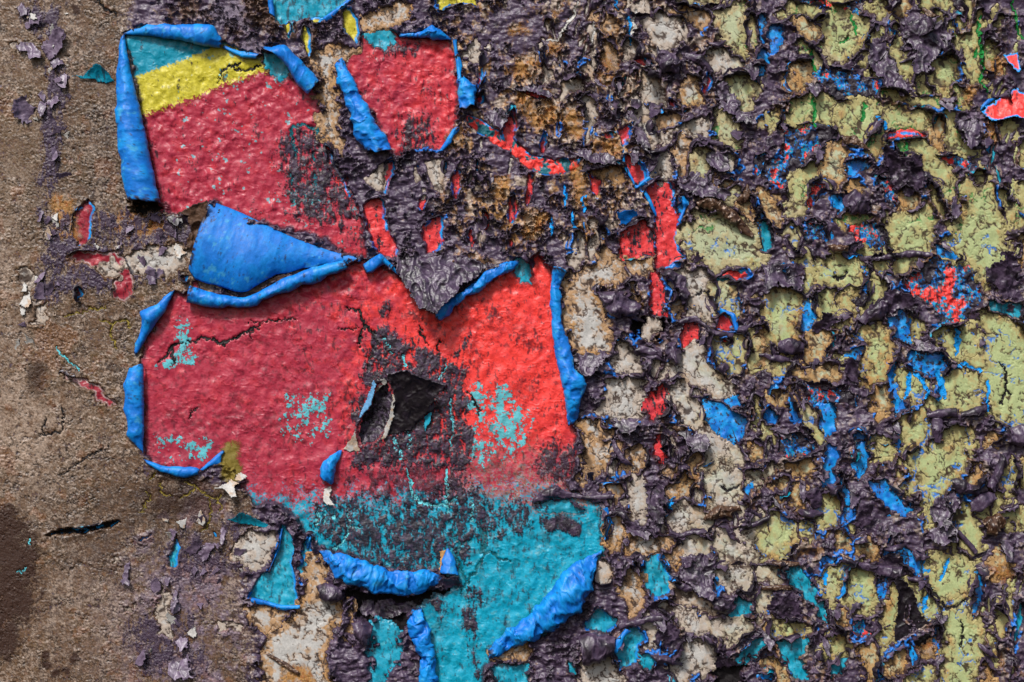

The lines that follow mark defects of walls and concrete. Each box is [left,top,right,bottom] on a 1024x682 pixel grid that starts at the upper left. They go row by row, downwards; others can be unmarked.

peeling [10,23,66,73]
peeling [559,24,646,102]
peeling [1003,52,1021,72]
peeling [676,70,709,107]
peeling [11,90,70,139]
peeling [979,82,1024,168]
peeling [567,147,628,186]
peeling [671,195,689,224]
peeling [14,267,60,349]
crack [158,317,297,366]
peeling [567,628,631,682]
peeling [903,640,938,682]